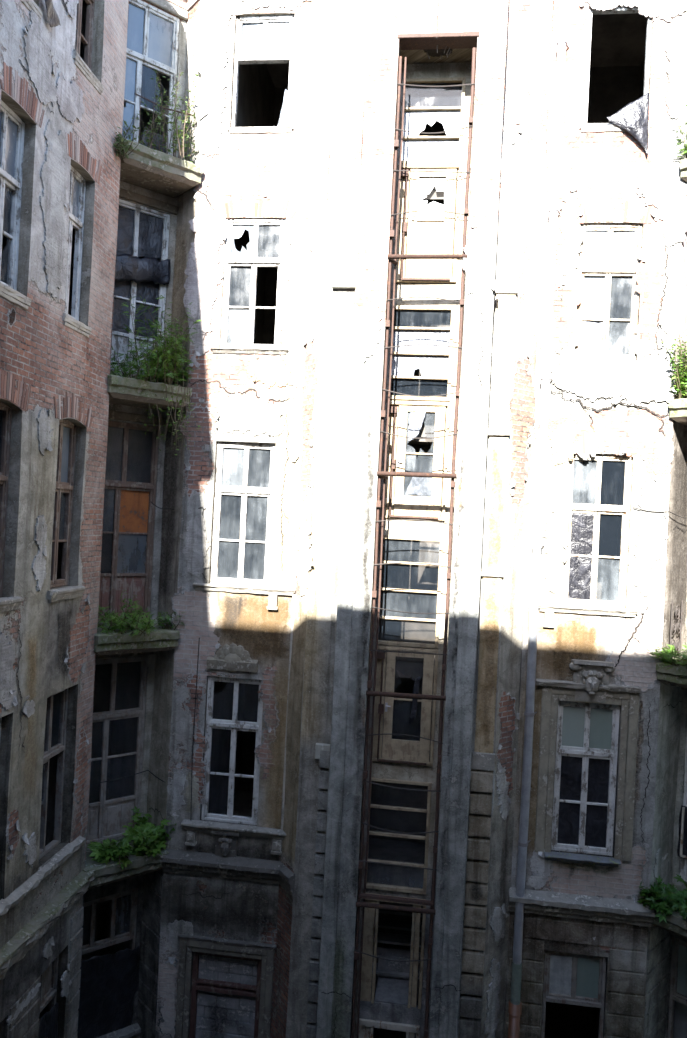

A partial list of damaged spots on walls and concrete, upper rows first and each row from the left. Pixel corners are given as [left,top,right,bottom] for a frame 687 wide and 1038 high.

peeling [64,0,79,19]
peeling [579,0,687,23]
peeling [179,0,279,202]
peeling [22,10,85,298]
peeling [635,174,687,248]
peeling [179,217,270,499]
peeling [548,357,679,693]
peeling [0,632,35,718]
leakage [222,600,288,655]
crack [615,606,649,667]
flaking render [158,920,194,1038]
peeling [484,958,502,1038]